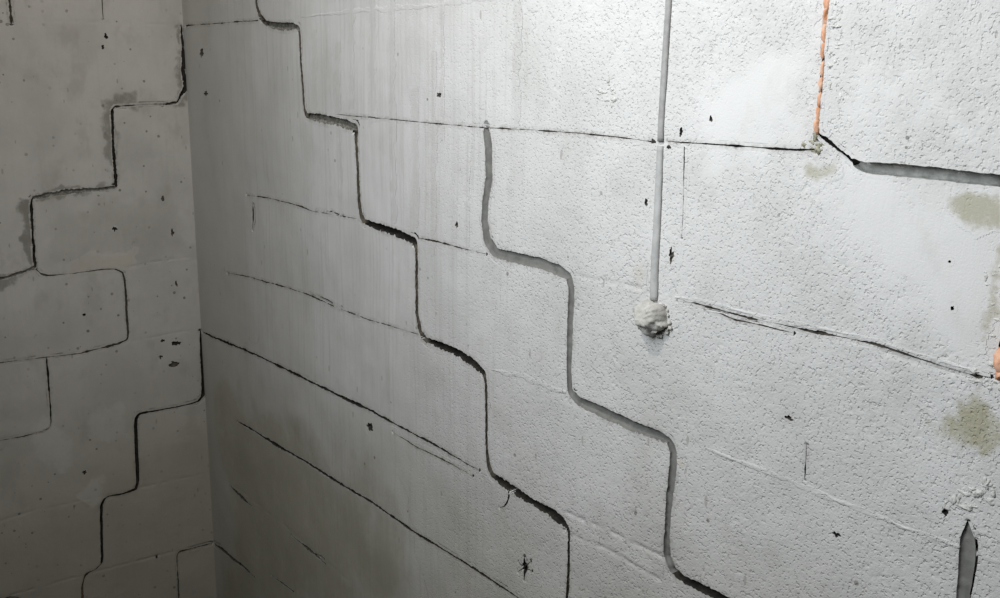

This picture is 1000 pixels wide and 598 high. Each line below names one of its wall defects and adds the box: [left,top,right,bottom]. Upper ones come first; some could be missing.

crack [668,0,1000,237]
crack [0,0,736,598]
crack [678,299,1000,382]
crack [952,520,982,598]